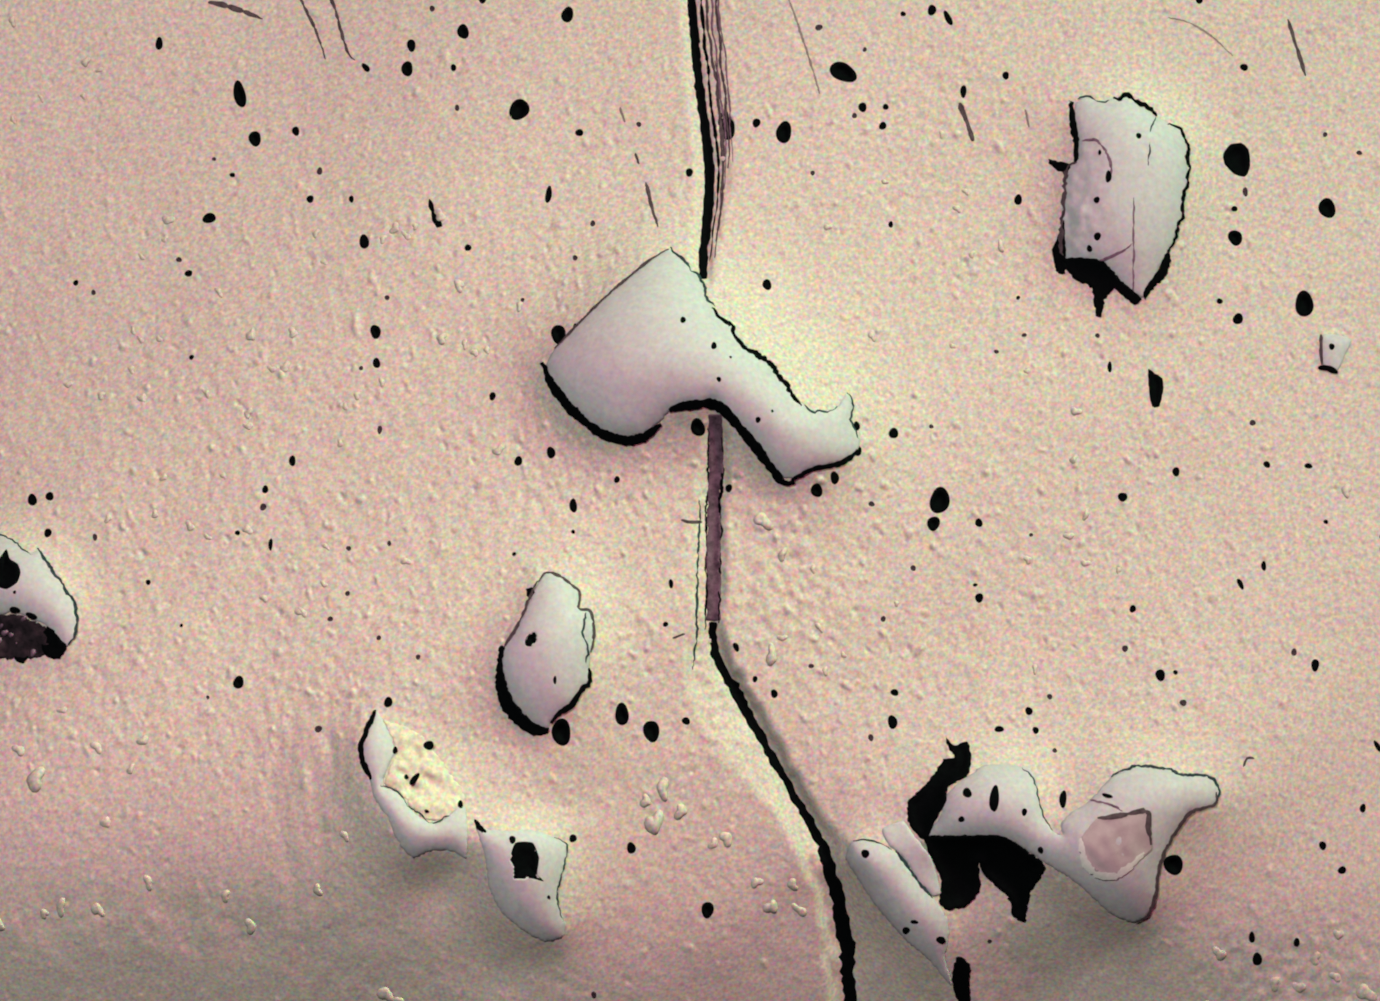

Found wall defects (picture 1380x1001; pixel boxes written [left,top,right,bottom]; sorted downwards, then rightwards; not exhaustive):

spalling [551,323,576,344]
spalling [691,418,705,436]
crack [687,0,735,279]
peeling [1048,92,1191,338]
peeling [0,529,79,663]
peeling [495,571,596,746]
crack [681,414,857,1001]
peeling [845,737,1221,1001]